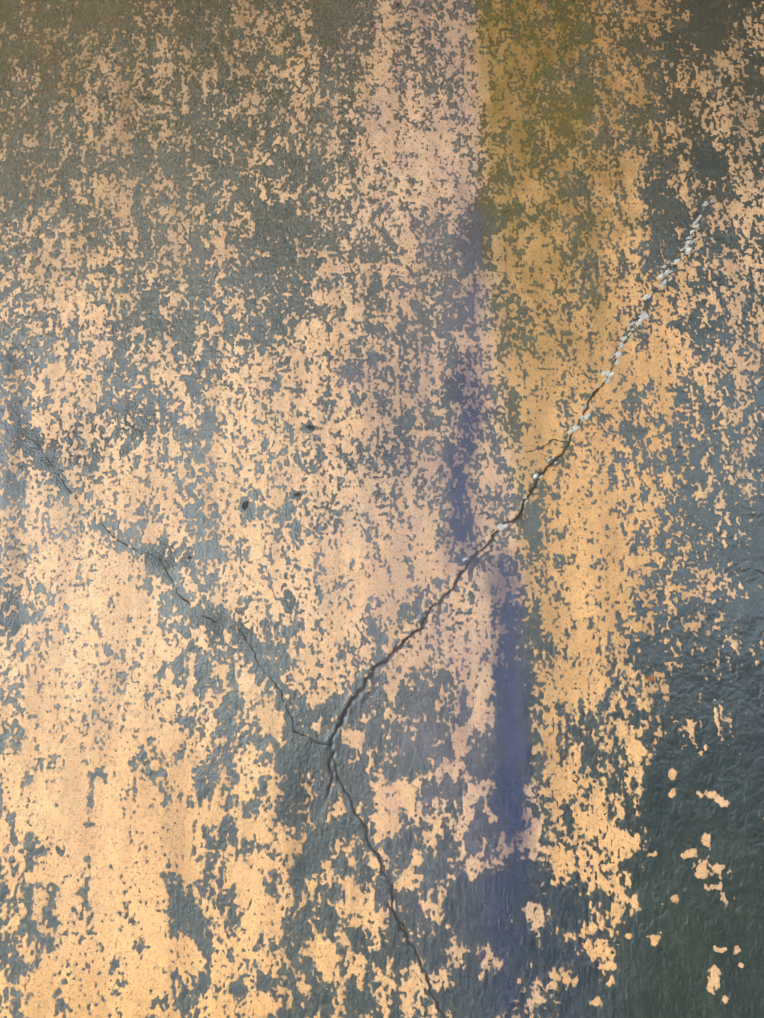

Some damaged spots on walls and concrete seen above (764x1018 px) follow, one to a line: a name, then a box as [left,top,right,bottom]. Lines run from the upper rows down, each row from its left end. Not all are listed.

peeling [0,0,42,172]
crack [24,199,713,1018]
peeling [671,714,708,757]
peeling [713,699,734,745]
peeling [668,761,677,798]
peeling [696,790,730,808]
peeling [681,832,735,908]
peeling [522,893,552,949]
peeling [476,942,503,981]
peeling [495,964,579,1018]
peeling [706,964,729,1004]
peeling [713,945,744,968]